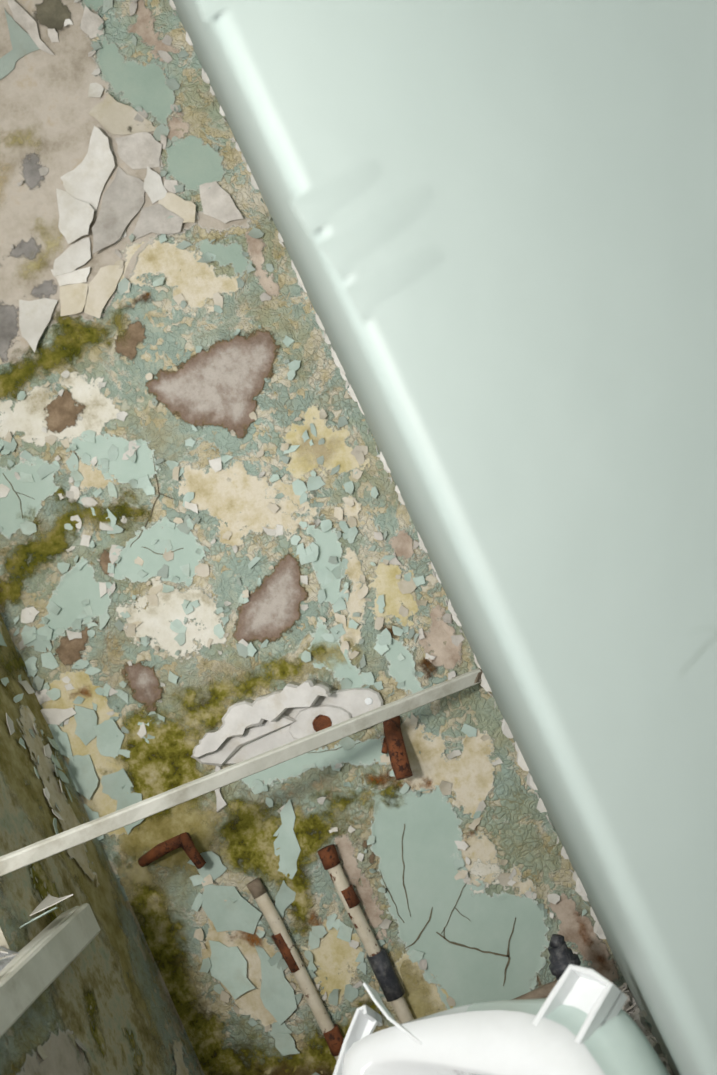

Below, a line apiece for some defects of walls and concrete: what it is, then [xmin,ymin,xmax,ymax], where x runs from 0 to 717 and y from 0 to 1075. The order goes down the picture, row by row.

peeling [0,0,280,365]
spalling [145,325,301,447]
peeling [291,260,364,415]
damp [0,614,90,838]
peeling [0,369,620,1018]
damp [57,796,220,1040]
peeling [187,851,303,1056]
crack [380,824,516,986]
spalling [15,1022,91,1075]
peeling [172,1036,191,1075]
damp [261,1063,332,1075]